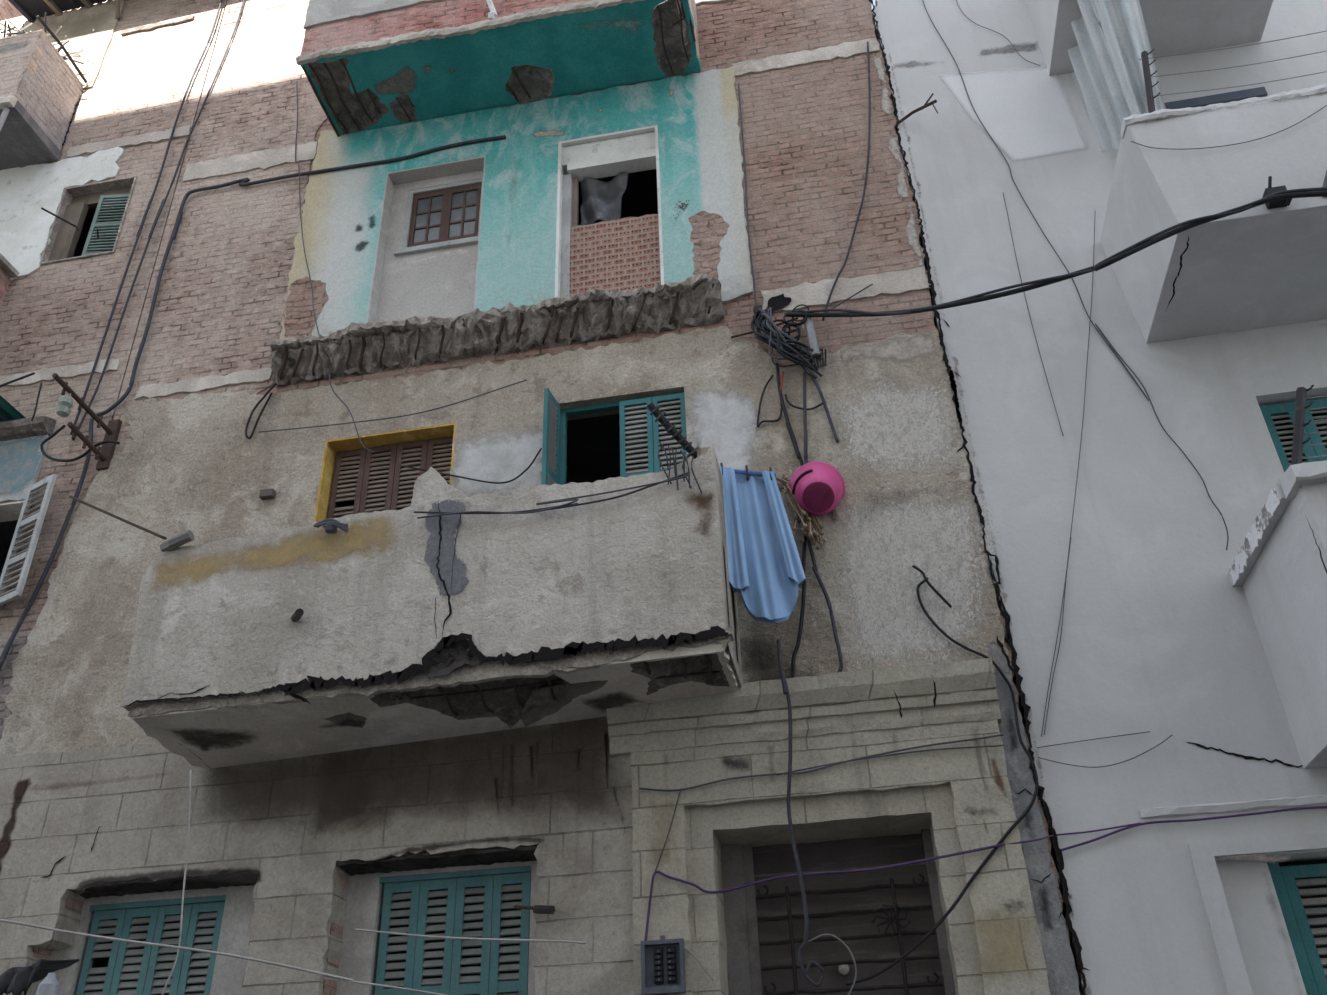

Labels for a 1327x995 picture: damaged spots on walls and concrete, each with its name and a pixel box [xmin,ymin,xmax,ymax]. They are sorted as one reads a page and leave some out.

spalling [303,58,430,137]
spalling [505,64,555,104]
flaking render [688,211,730,288]
crack [1166,235,1189,310]
flaking render [279,276,329,380]
crack [869,0,1091,995]
leakage [158,519,391,587]
crack [1305,515,1327,574]
crack [121,500,462,707]
spalling [127,626,742,728]
crack [1187,742,1303,768]